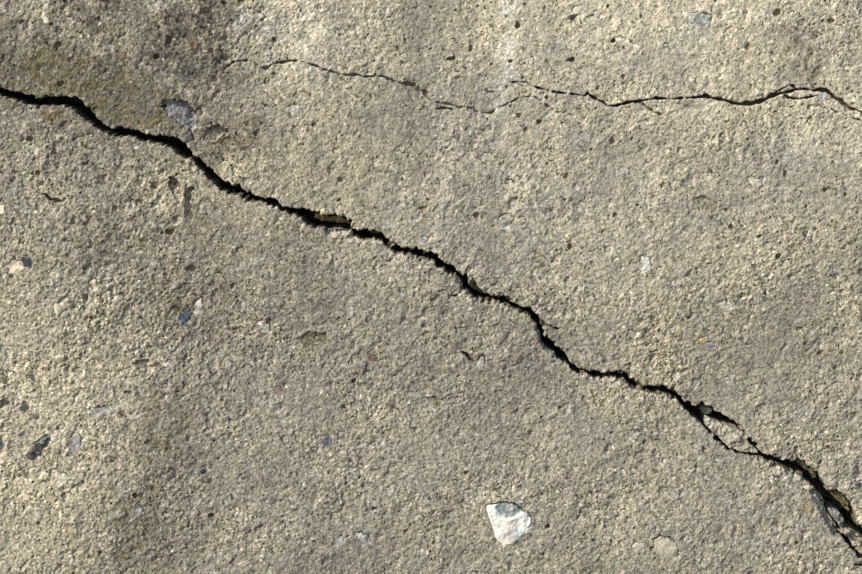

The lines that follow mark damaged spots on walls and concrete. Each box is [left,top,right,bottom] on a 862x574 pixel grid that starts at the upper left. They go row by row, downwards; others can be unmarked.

crack [225,59,862,123]
crack [0,87,862,534]
crack [836,520,862,559]